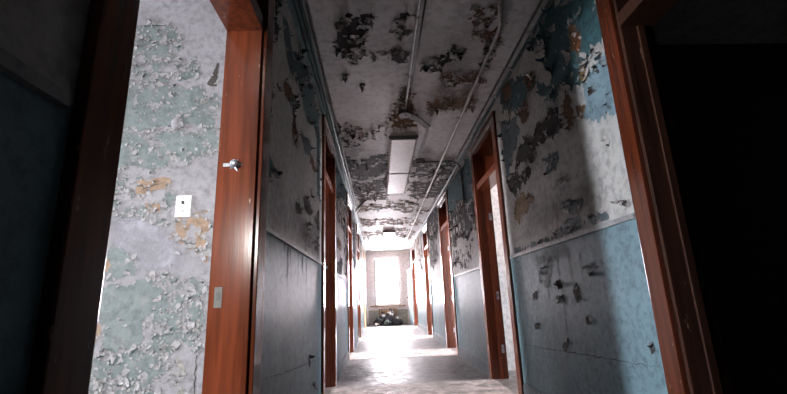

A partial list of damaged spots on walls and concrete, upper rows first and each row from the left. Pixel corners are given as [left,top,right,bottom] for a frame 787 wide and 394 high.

peeling [89,19,221,394]
peeling [271,0,508,287]
peeling [497,0,616,225]